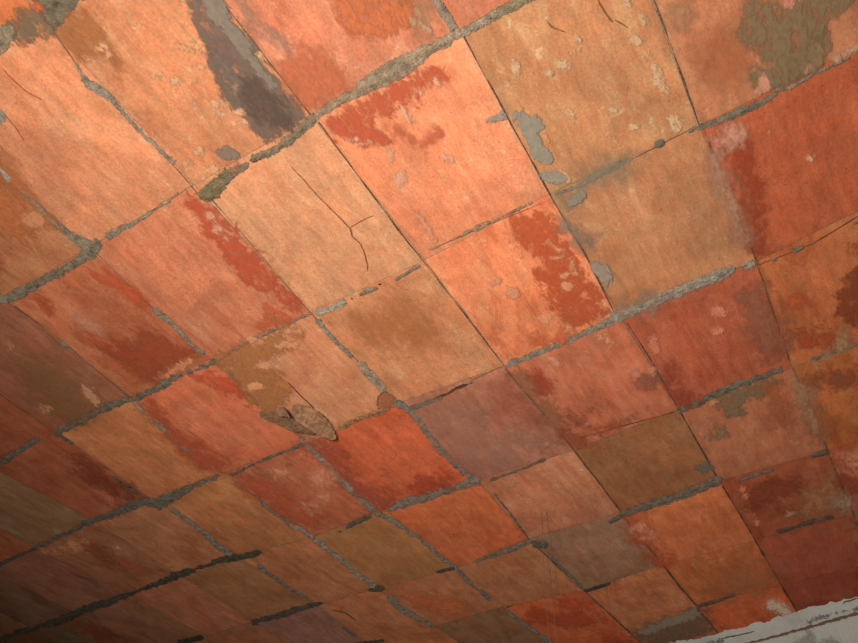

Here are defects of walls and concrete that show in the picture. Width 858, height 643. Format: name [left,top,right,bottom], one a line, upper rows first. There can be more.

damp [332,0,432,40]
damp [215,145,240,160]
damp [186,0,349,143]
damp [325,66,450,163]
crack [292,168,371,269]
damp [636,608,714,643]